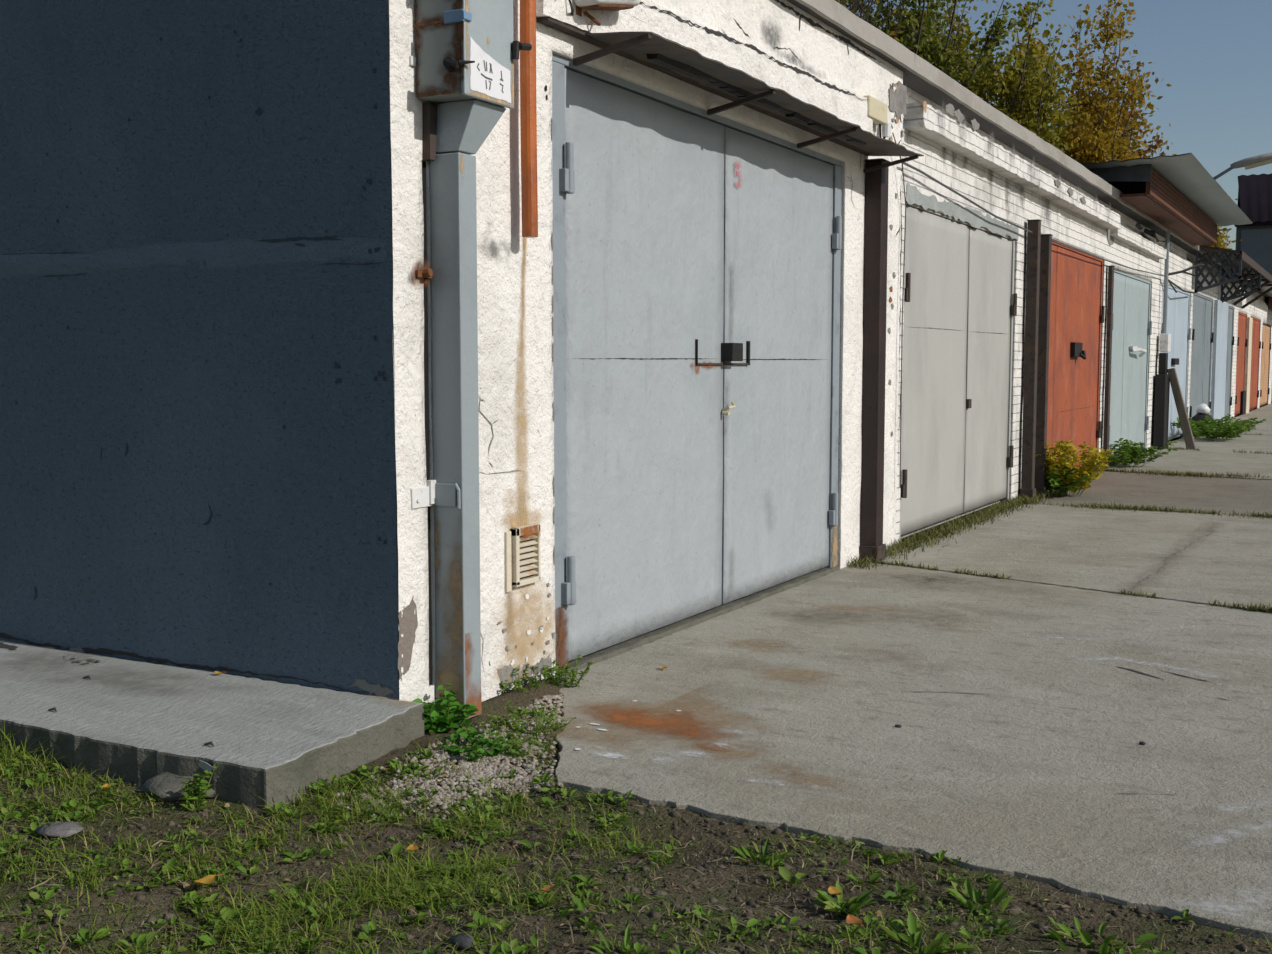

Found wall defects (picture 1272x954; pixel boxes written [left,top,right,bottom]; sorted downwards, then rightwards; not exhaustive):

crack [640,0,892,100]
crack [257,236,383,265]
rust [412,266,433,281]
spalling [422,161,430,480]
crack [478,394,524,474]
rust [507,237,539,539]
peeling [348,506,432,697]
rust [560,702,752,758]